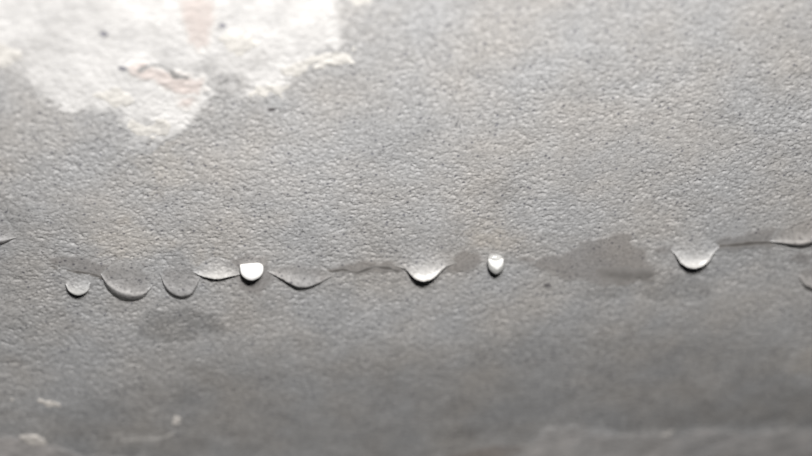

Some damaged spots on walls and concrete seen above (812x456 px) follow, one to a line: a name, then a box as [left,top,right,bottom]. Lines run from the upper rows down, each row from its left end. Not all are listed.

peeling [0,0,378,155]
damp [104,121,213,208]
damp [73,213,250,268]
damp [448,172,534,257]
damp [20,264,812,456]